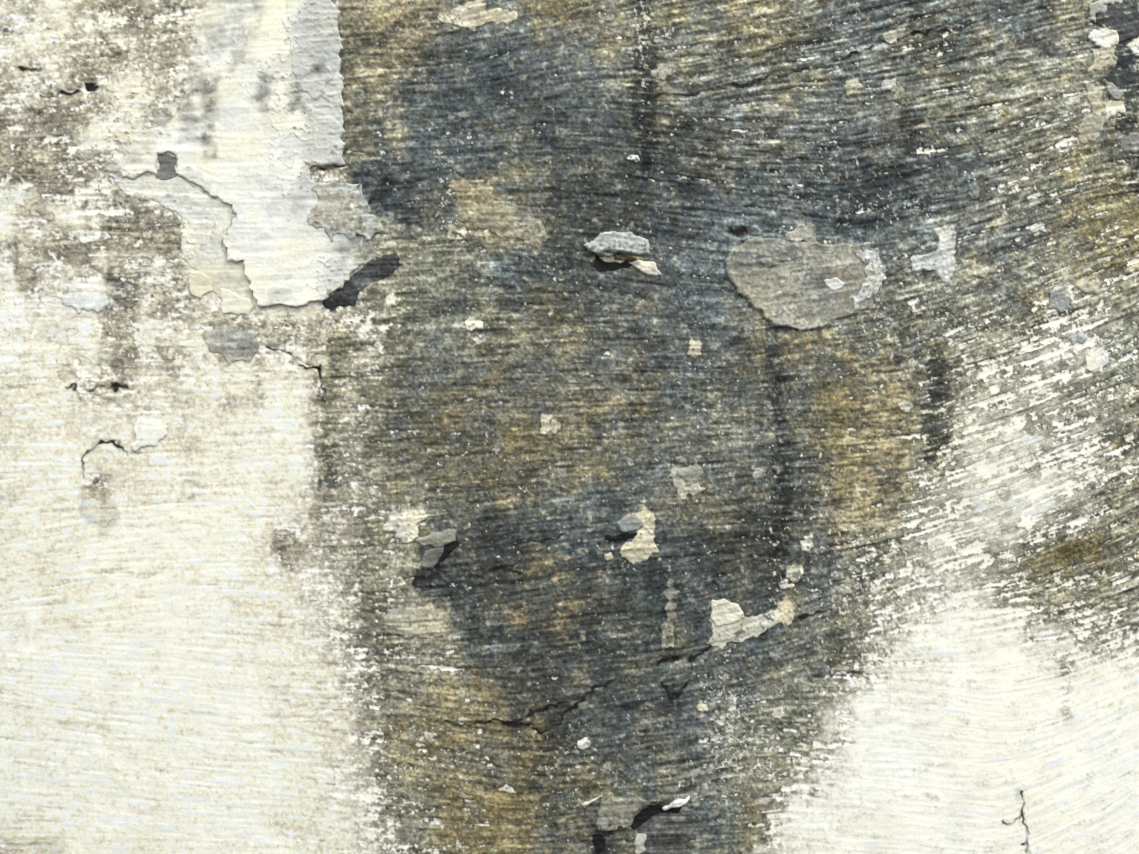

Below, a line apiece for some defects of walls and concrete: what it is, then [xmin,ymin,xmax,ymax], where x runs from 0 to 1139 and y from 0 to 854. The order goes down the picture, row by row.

peeling [104,0,401,365]
spalling [584,231,662,276]
peeling [725,224,887,331]
crack [81,440,126,476]
damp [309,0,1139,854]
damp [273,530,301,565]
spalling [383,505,460,639]
spalling [604,497,659,564]
spalling [706,532,814,650]
spalling [581,792,698,854]
crack [1002,790,1028,852]